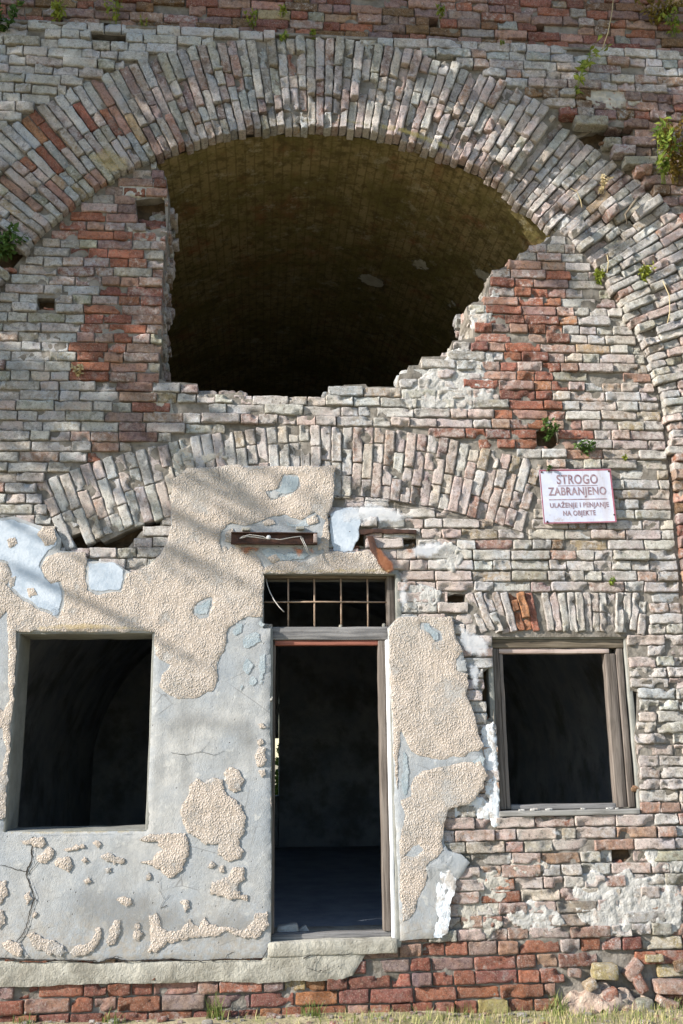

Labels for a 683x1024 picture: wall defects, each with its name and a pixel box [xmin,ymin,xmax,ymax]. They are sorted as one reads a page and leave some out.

peeling [0,519,62,615]
peeling [88,562,123,591]
corrosion [377,549,393,572]
peeling [255,723,267,777]
peeling [431,671,500,827]
peeling [1,920,121,957]
peeling [22,837,125,873]
crack [0,836,268,963]
peeling [139,767,248,901]
peeling [133,899,269,953]
spalling [433,858,565,939]
spalling [569,849,683,938]